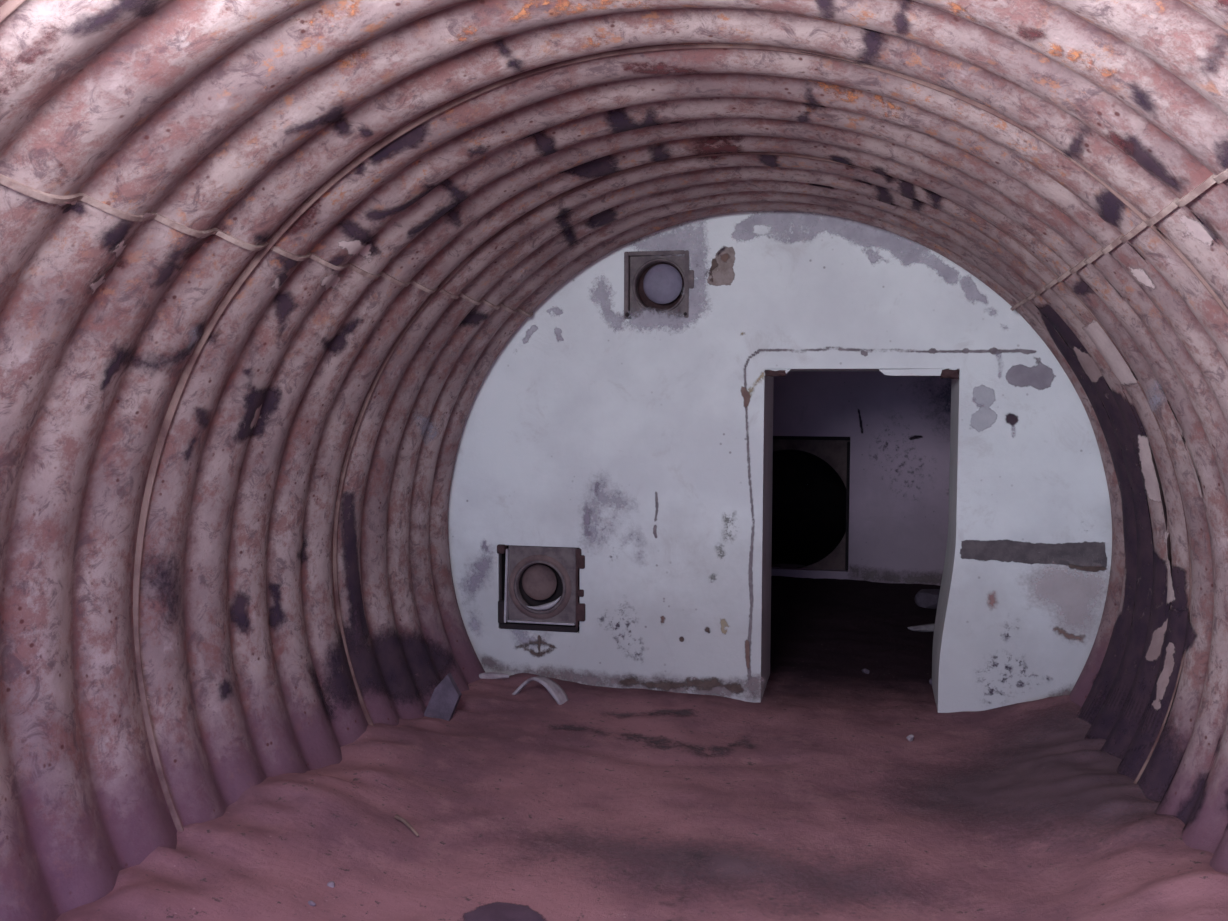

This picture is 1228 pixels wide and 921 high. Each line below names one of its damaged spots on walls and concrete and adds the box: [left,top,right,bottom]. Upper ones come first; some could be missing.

rust [510,0,647,20]
rust [623,62,698,75]
rust [1048,44,1115,77]
peeling [285,106,373,137]
peeling [355,123,428,175]
rust [693,136,741,161]
flaking render [591,211,996,331]
flaking render [1006,358,1056,390]
peeling [235,369,282,441]
peeling [1036,304,1202,757]